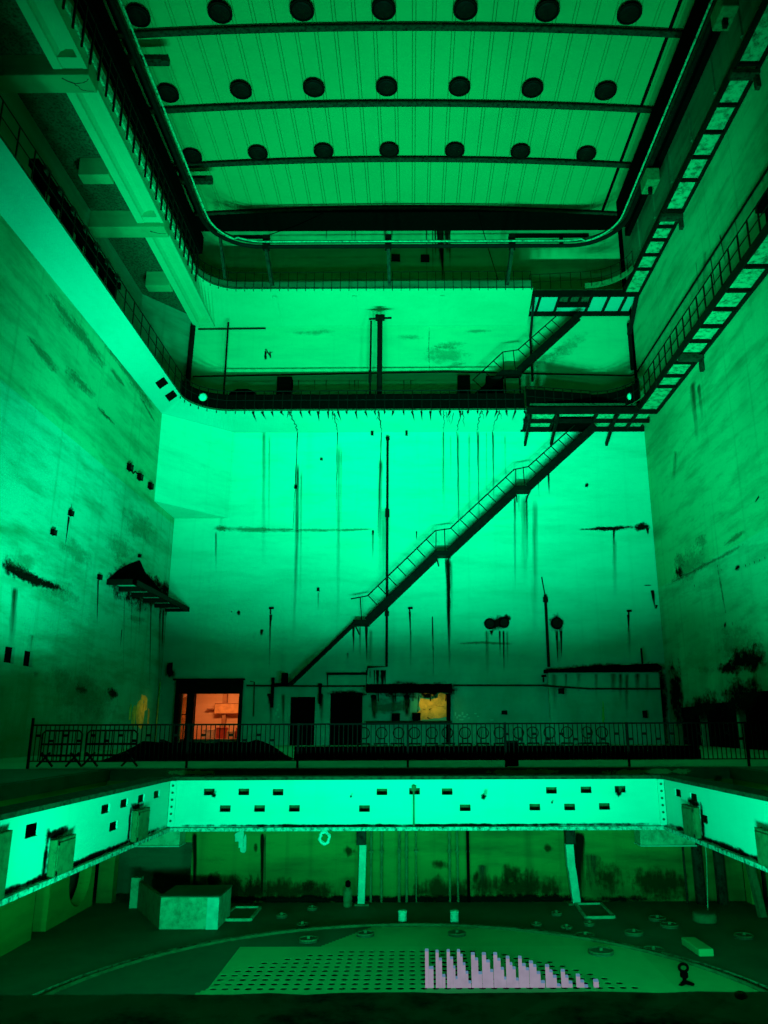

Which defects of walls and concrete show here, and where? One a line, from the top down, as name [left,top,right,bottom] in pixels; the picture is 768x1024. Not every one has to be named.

damp [217,468,326,533]
damp [580,522,649,553]